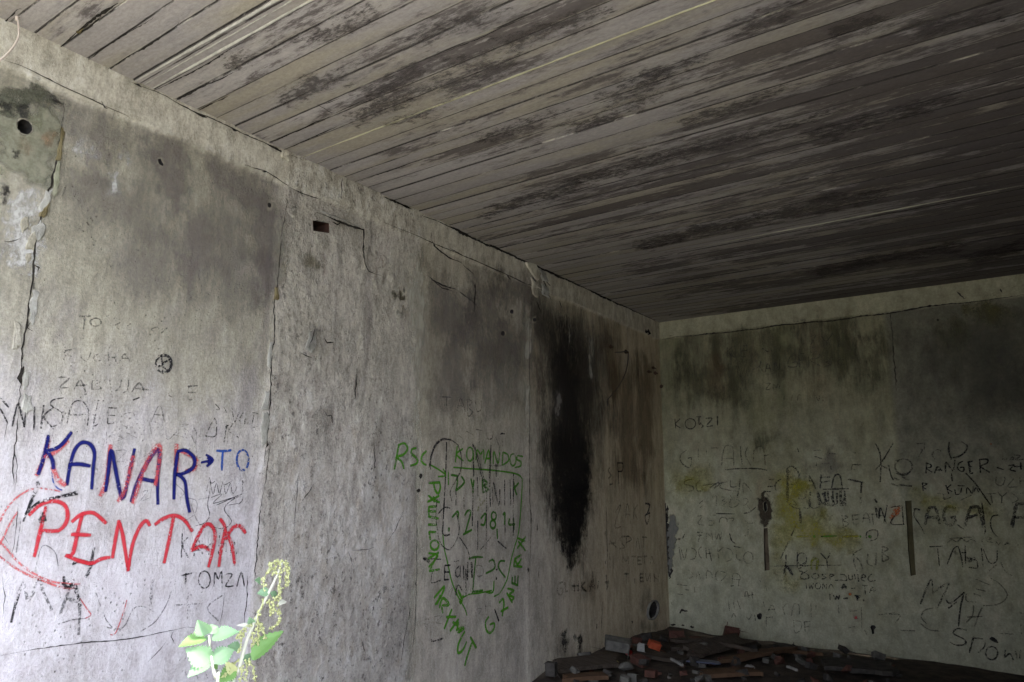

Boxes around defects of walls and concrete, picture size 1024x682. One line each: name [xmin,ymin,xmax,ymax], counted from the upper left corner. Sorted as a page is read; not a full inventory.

damp [279,67,350,108]
damp [294,3,376,43]
damp [345,8,615,128]
damp [477,53,706,143]
damp [478,98,956,219]
damp [632,188,895,250]
crack [3,60,127,485]
crack [134,83,381,621]
crack [2,511,18,614]
crack [1,627,193,662]